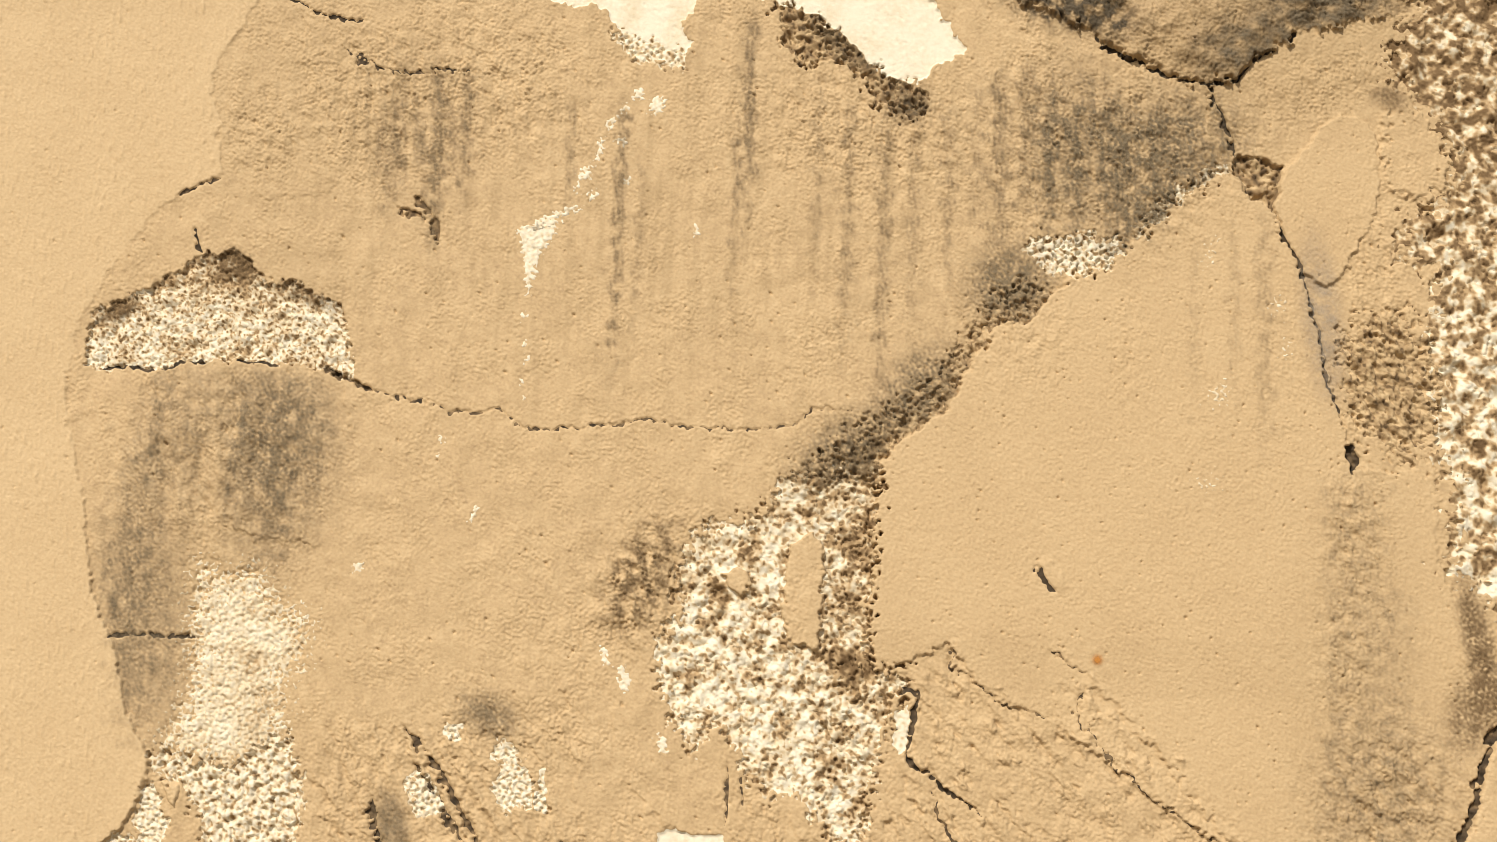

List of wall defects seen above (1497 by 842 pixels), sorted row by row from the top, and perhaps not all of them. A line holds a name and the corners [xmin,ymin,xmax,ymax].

spalling [551,0,696,74]
spalling [762,0,967,126]
crack [103,359,279,373]
spalling [83,248,355,380]
leakage [225,381,314,503]
crack [323,367,852,432]
spalling [651,154,1284,842]
crack [1271,211,1340,418]
spalling [1331,0,1497,622]
spalling [106,535,327,842]
crack [900,687,982,842]
crack [1456,726,1497,842]